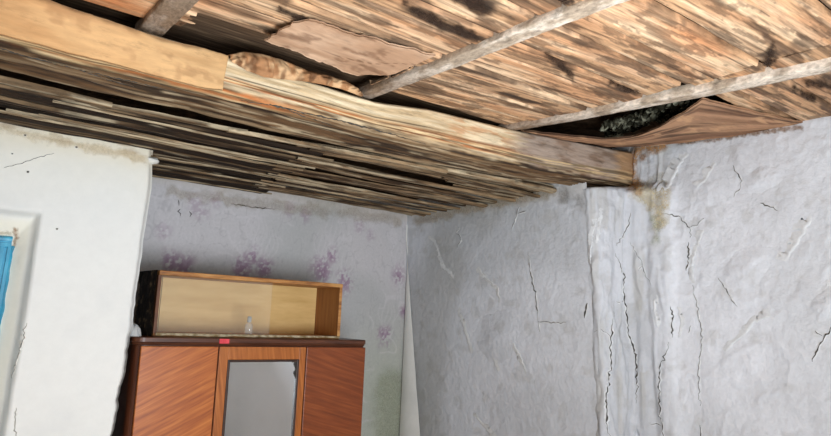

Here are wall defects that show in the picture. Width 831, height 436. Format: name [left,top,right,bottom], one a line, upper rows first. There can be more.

leakage [462,0,487,15]
crack [528,213,704,436]
crack [811,327,831,362]